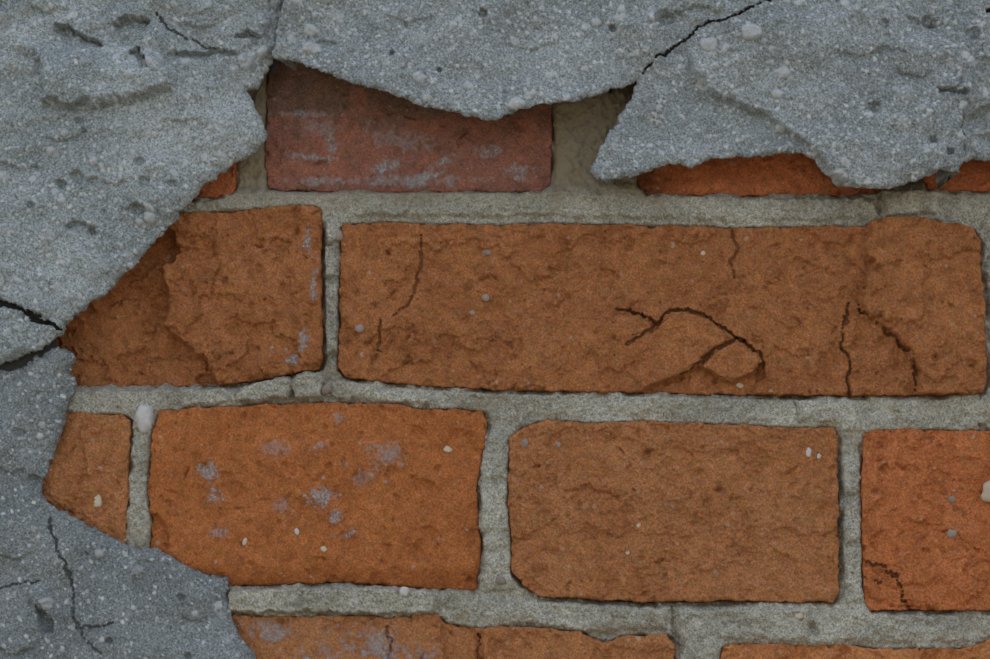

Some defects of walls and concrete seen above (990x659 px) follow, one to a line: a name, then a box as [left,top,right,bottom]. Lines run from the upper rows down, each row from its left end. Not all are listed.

crack [642,0,771,74]
flaking render [685,0,990,190]
spalling [64,220,98,236]
crack [0,299,62,371]
spalling [55,230,218,387]
spalling [615,307,766,396]
spalling [151,514,169,552]
spalling [35,607,53,634]
spalling [441,622,483,659]